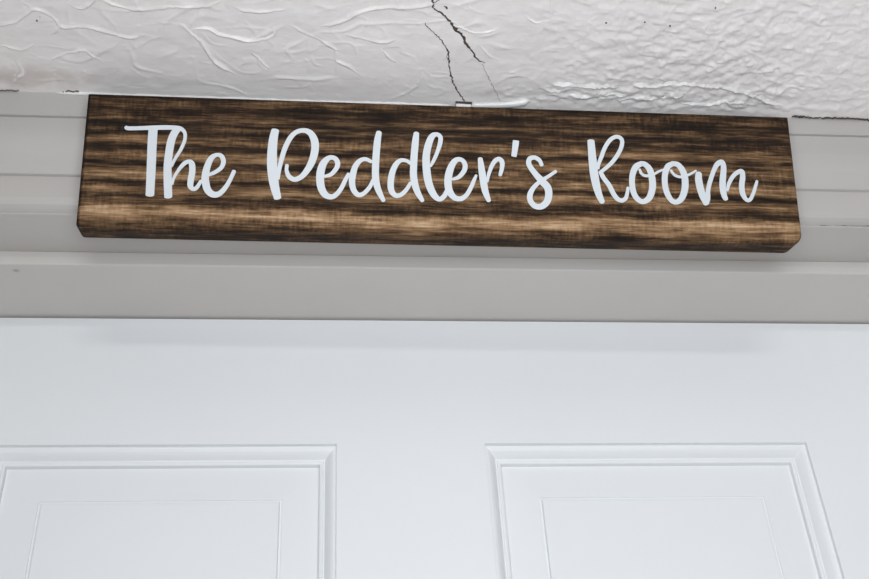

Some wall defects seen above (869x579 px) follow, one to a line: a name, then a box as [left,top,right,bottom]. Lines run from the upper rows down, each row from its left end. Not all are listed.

crack [425,0,500,101]